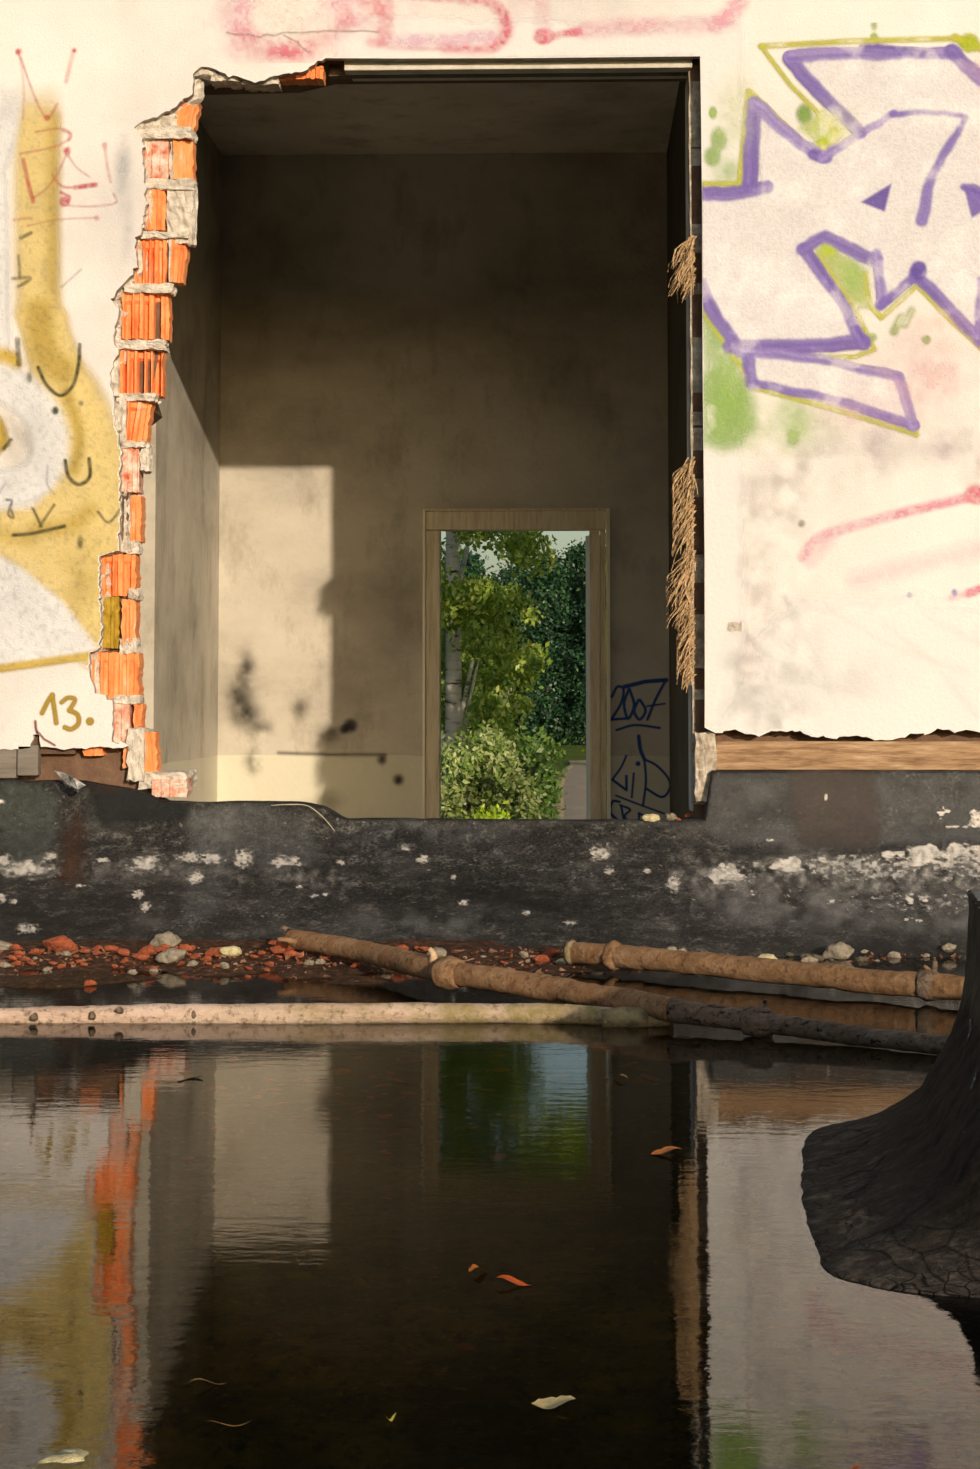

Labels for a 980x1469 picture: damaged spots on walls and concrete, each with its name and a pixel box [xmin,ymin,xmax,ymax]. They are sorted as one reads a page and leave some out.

spalling [194,65,326,92]
spalling [82,104,203,797]
crack [846,1196,980,1283]